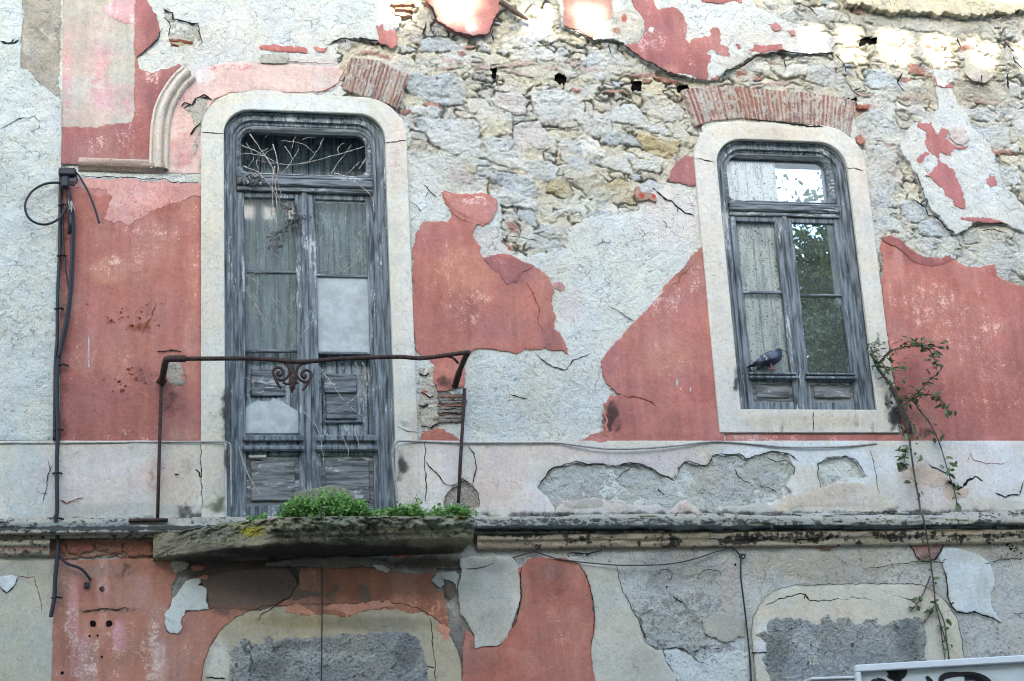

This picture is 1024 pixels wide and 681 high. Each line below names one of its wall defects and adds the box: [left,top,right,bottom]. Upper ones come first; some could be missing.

peeling [21,0,203,165]
crack [290,37,379,94]
crack [564,25,689,79]
flaking render [60,0,1024,517]
leakage [710,512,752,530]
leakage [766,509,973,529]
peeling [51,541,249,681]
peeling [265,537,750,681]
crack [766,593,921,608]
peeling [909,544,1001,622]